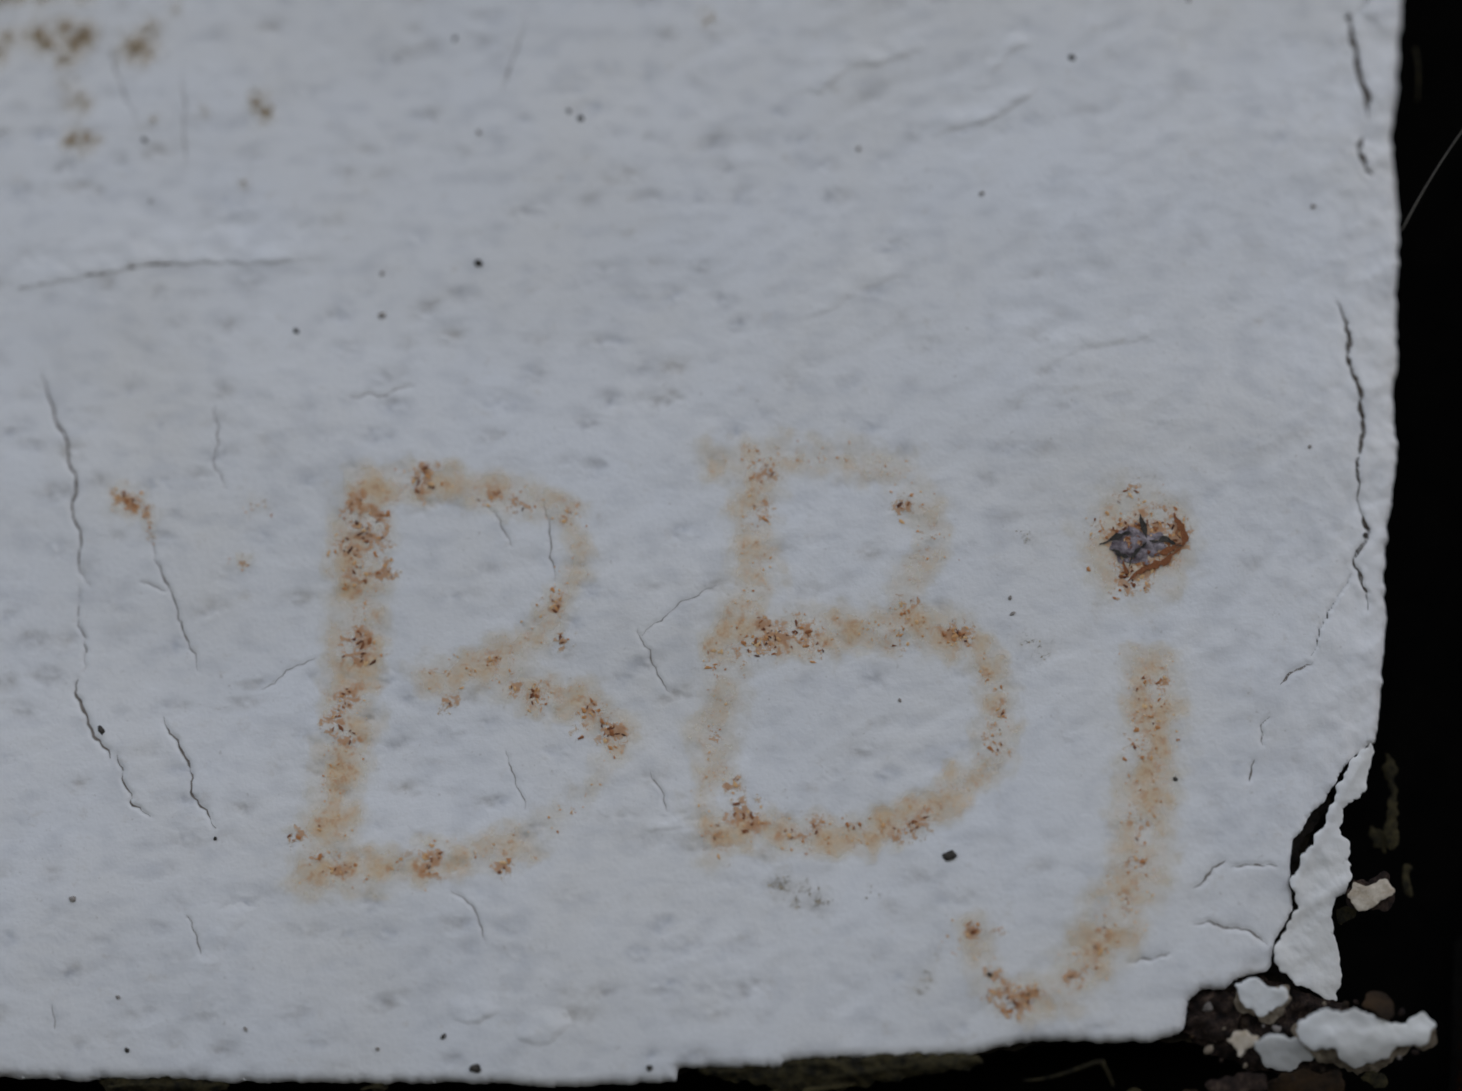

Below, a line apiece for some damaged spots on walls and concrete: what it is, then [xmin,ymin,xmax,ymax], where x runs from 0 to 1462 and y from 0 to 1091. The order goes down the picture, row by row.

damp [0,0,94,110]
crack [1347,0,1373,175]
crack [41,376,151,817]
rust [287,461,629,891]
rust [698,438,1011,866]
rust [942,660,1180,1021]
rust [1085,484,1193,601]
peeling [1182,743,1437,1091]
crack [1281,302,1370,684]